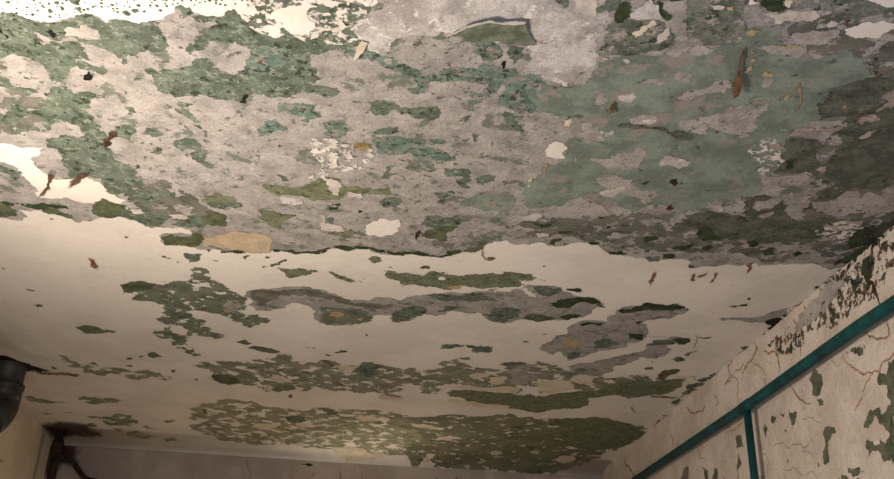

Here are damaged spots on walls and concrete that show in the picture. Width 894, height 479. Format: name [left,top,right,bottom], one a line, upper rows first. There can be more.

peeling [0,0,894,356]
peeling [26,395,177,442]
peeling [120,266,719,475]
crack [686,319,817,478]
peeling [763,411,797,436]
peeling [809,369,823,406]
peeling [818,426,836,467]
peeling [838,467,863,479]
crack [828,277,894,411]
peeling [864,359,894,463]